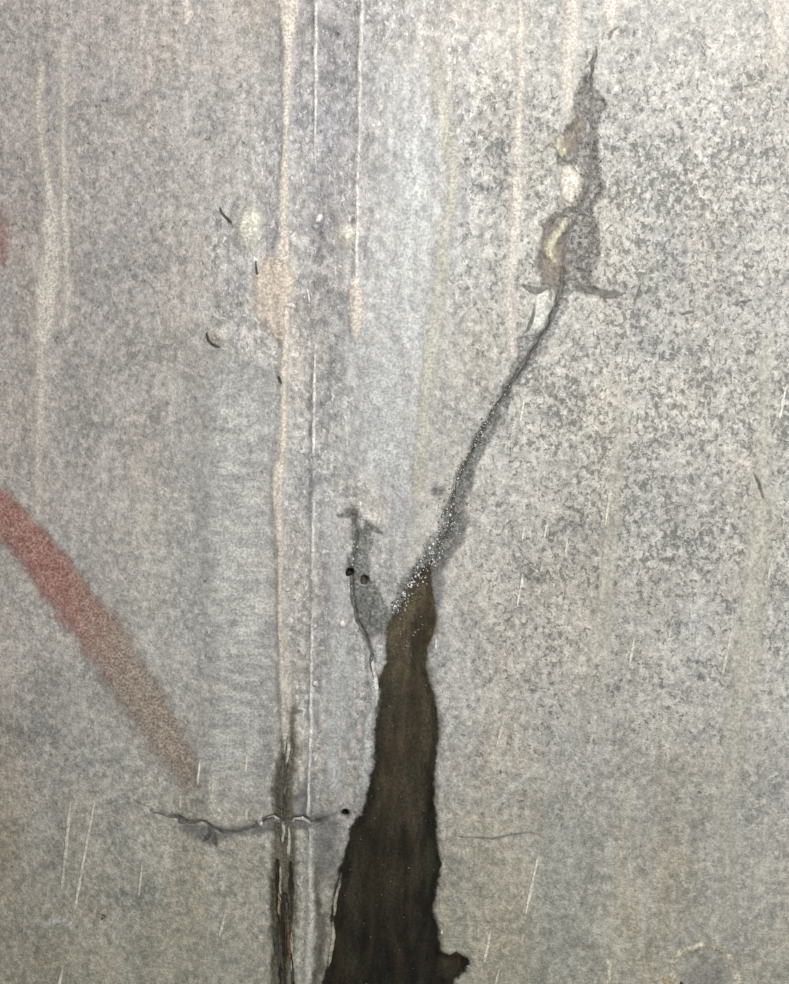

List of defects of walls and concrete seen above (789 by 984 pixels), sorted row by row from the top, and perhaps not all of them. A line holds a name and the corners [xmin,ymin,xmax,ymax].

damp [254,0,469,984]
crack [150,26,640,854]